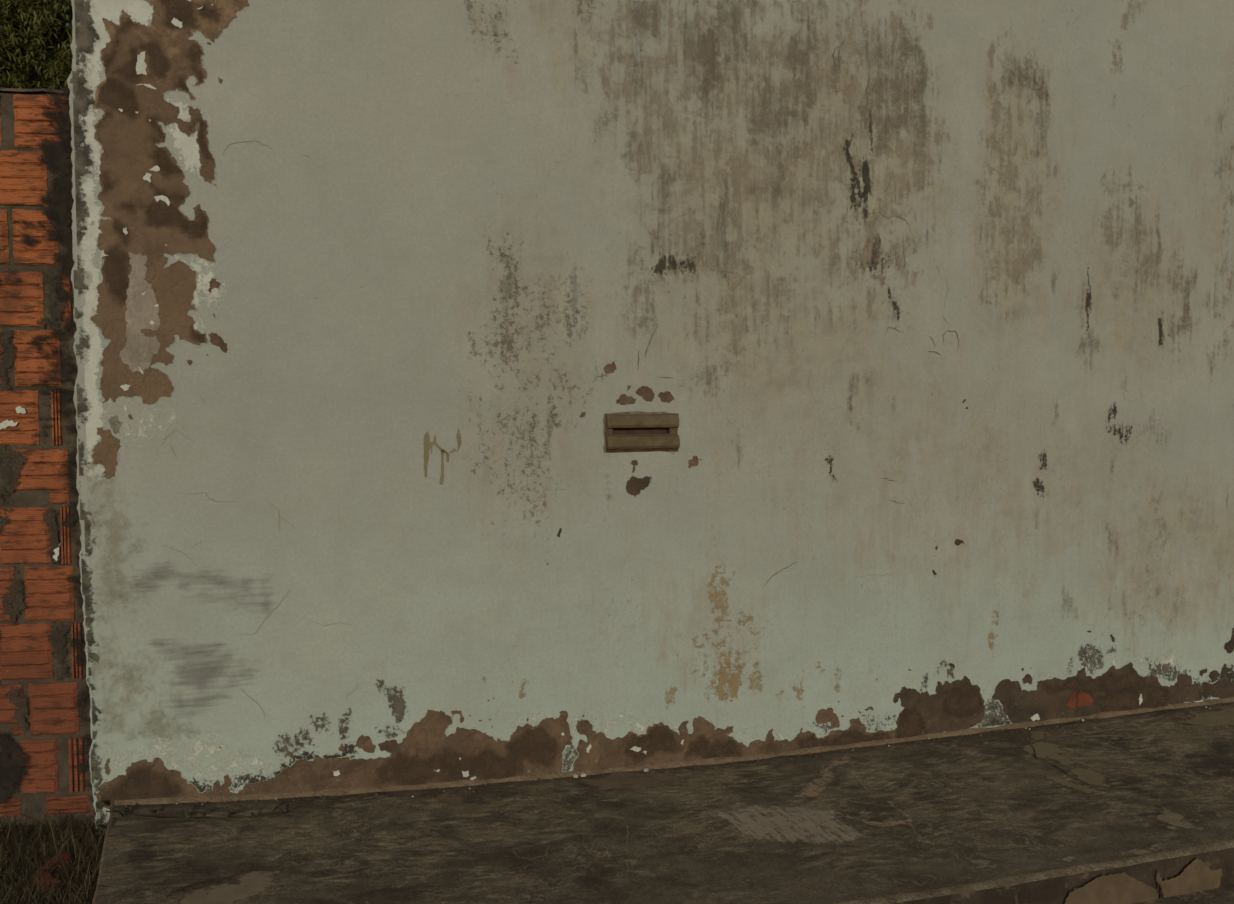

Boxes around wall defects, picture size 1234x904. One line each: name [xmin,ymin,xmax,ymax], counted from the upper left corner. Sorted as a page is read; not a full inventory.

peeling [89,0,250,479]
damp [599,0,949,372]
damp [977,68,1042,292]
damp [467,233,586,523]
spalling [625,460,652,497]
peeling [616,386,675,405]
damp [0,732,30,804]
peeling [95,625,1234,810]
damp [1019,643,1234,701]